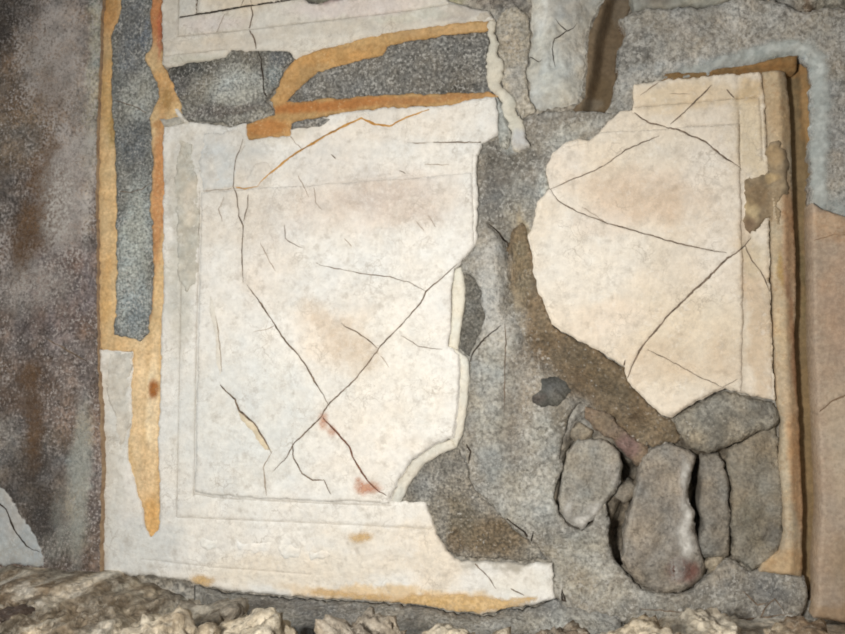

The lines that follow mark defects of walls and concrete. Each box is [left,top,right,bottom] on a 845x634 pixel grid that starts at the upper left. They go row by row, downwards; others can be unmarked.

crack [0,504,40,552]
crack [210,109,457,496]
crack [415,138,481,146]
spalling [392,267,547,561]
spalling [532,376,571,407]
crack [550,82,769,388]